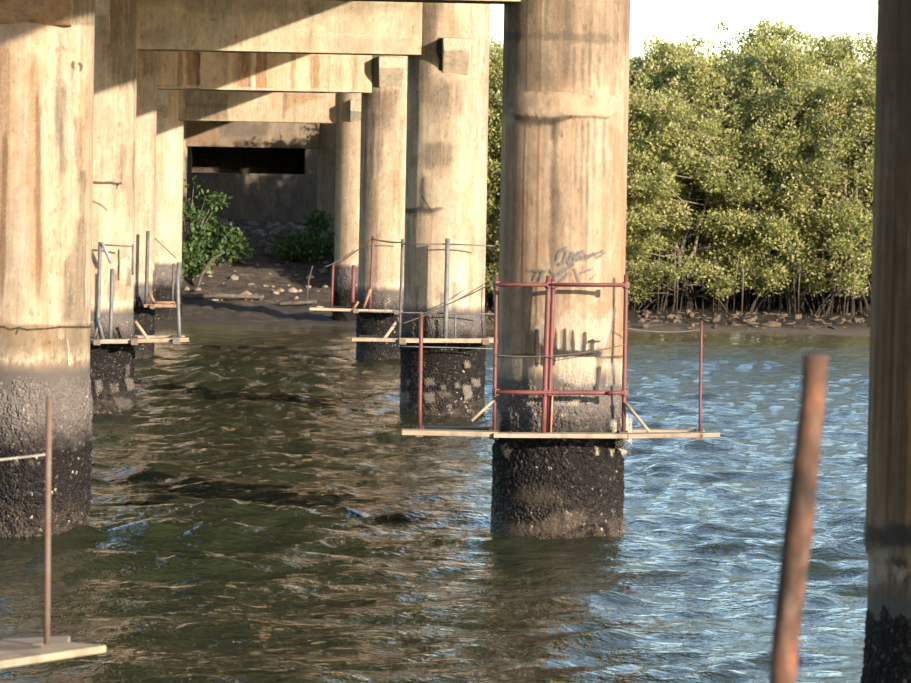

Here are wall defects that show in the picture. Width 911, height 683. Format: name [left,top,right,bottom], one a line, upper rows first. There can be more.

rust [187,52,200,89]
rust [241,53,266,90]
crack [0,326,92,334]